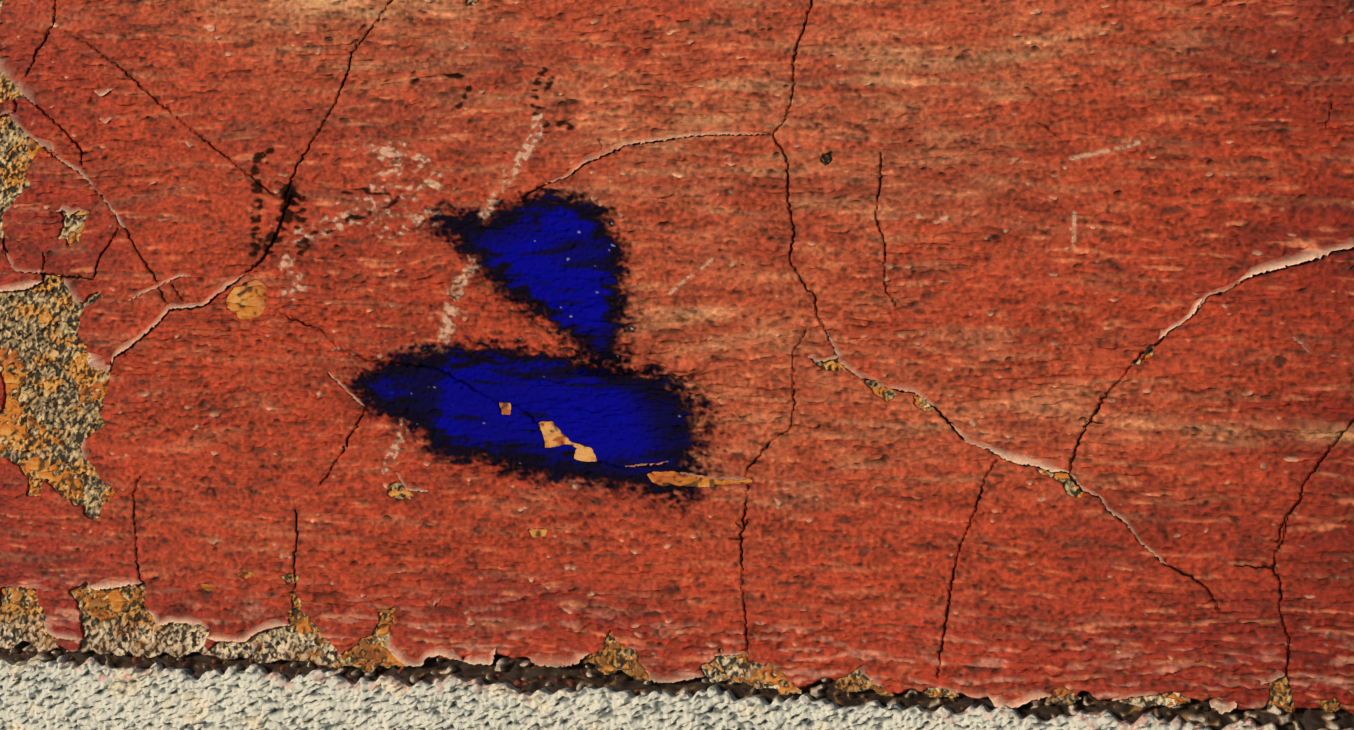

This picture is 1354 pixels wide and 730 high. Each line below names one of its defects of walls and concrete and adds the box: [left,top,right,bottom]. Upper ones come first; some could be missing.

flaking render [0,53,61,239]
crack [0,0,392,371]
flaking render [0,274,115,519]
crack [285,315,538,485]
crack [522,0,1354,707]
flaking render [0,574,496,673]
flaking render [528,631,802,695]
flaking render [832,665,895,696]
peeling [987,686,1081,708]
flaking render [1111,690,1190,708]
peeling [1209,698,1237,714]
flaking render [1260,669,1295,712]